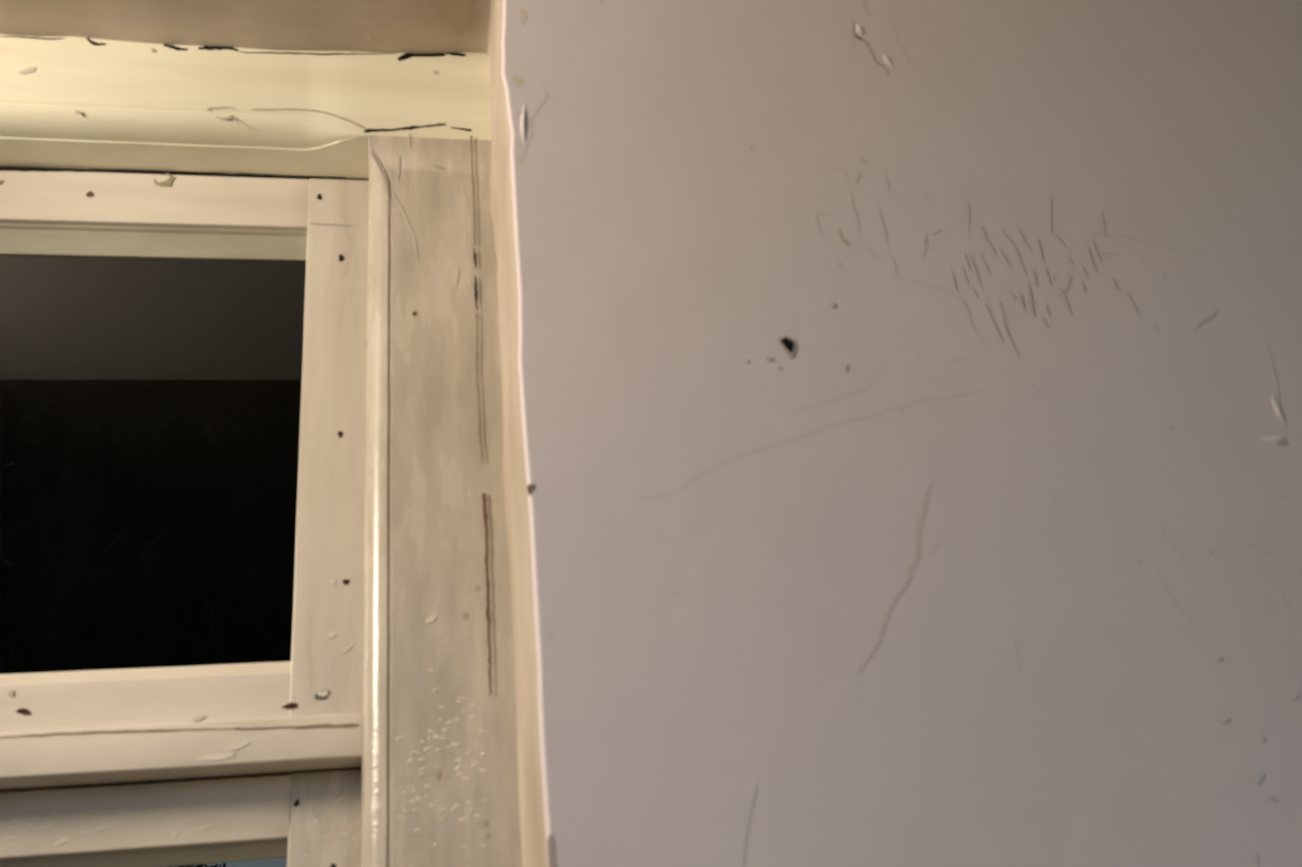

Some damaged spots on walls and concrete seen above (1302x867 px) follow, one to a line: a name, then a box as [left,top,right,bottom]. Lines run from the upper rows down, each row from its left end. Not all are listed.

crack [852,0,891,77]
crack [858,485,932,673]